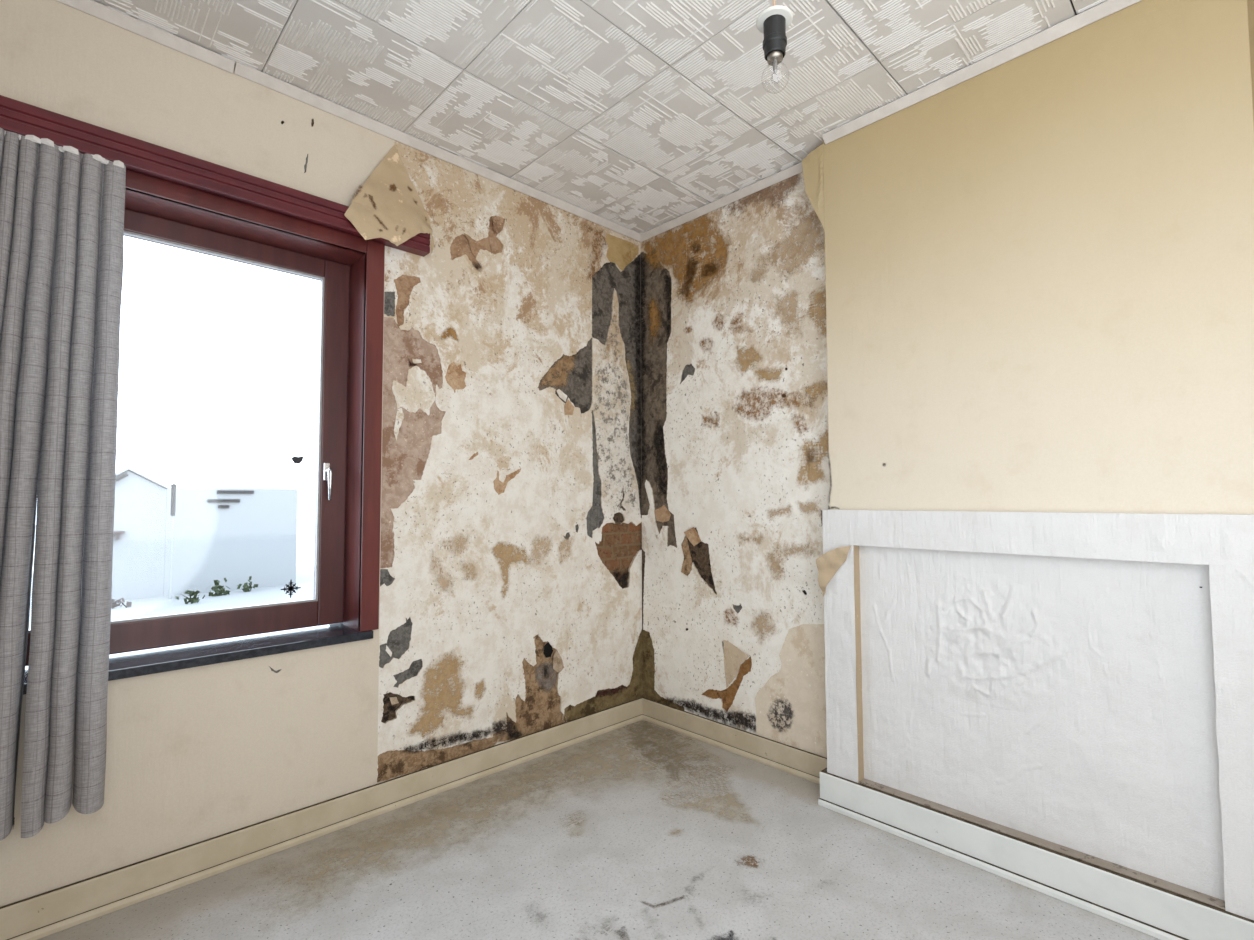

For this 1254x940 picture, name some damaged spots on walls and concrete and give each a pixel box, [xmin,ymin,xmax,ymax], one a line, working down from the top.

peeling [344,144,434,253]
spalling [538,337,593,415]
damp [592,250,677,548]
spalling [680,364,695,384]
spalling [493,468,521,495]
flaking render [564,512,642,589]
peeling [681,527,701,576]
peeling [723,640,749,688]
damp [404,655,512,753]
spalling [377,630,685,783]
damp [666,698,793,732]
damp [295,722,747,880]